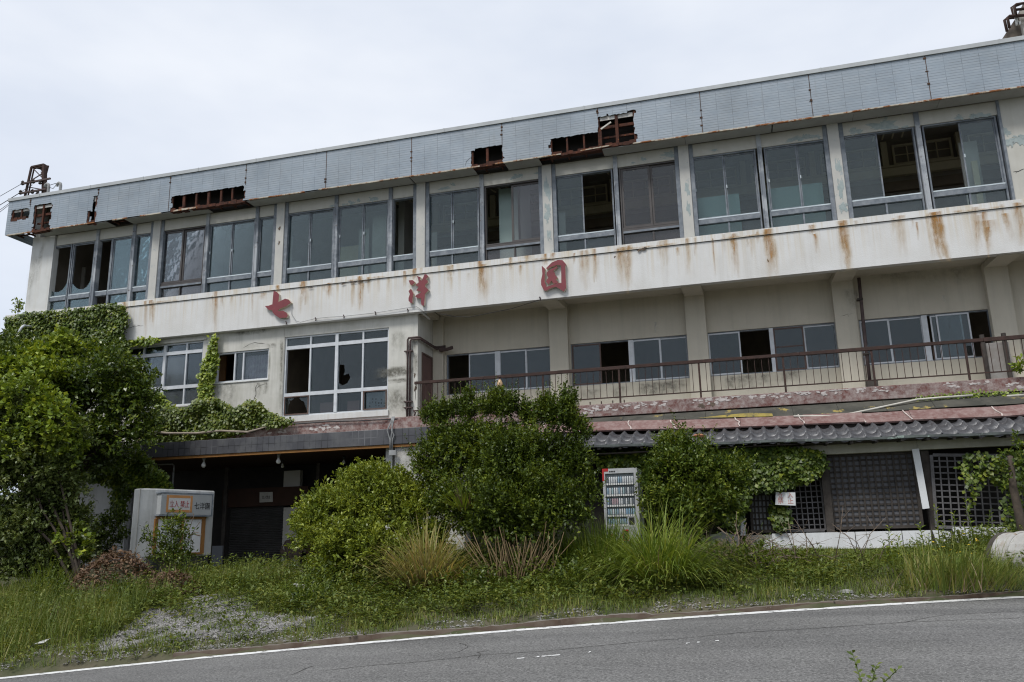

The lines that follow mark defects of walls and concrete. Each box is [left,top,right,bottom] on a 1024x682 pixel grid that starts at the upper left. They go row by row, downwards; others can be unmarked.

corrosion [931,211,943,242]